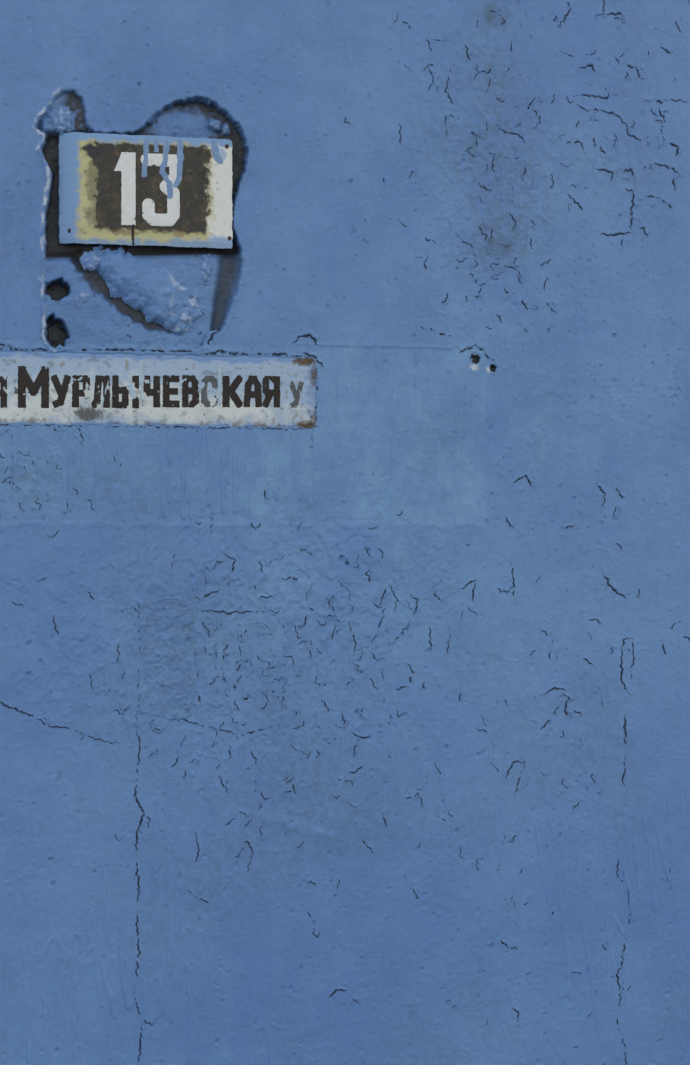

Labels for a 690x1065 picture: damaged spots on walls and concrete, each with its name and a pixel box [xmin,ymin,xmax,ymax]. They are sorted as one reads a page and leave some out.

peeling [552,0,573,28]
peeling [595,0,626,24]
peeling [404,38,460,136]
peeling [461,45,689,252]
peeling [456,218,557,314]
peeling [340,545,386,582]
peeling [114,552,443,793]
peeling [225,750,297,873]
crack [0,699,159,1065]
crack [613,858,632,1065]